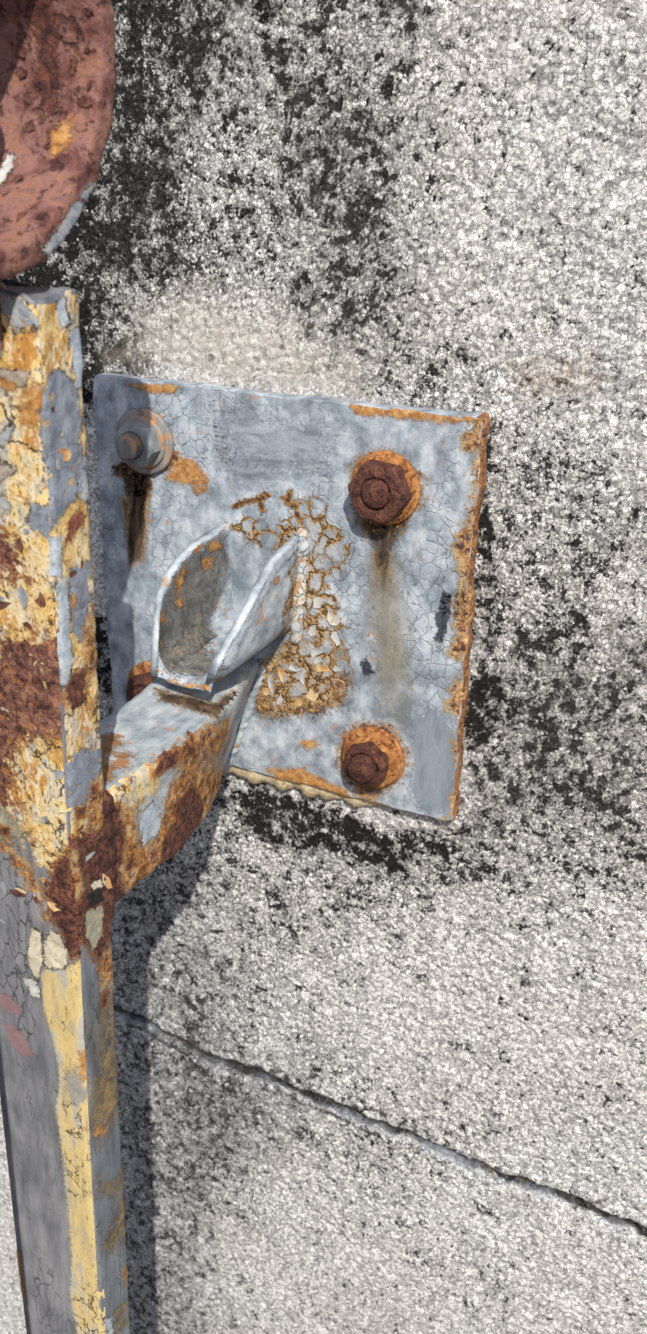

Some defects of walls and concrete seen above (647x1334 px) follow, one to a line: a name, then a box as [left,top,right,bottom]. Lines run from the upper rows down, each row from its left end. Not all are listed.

corrosion [14,0,93,159]
corrosion [0,151,24,188]
damp [10,0,438,403]
corrosion [0,516,46,608]
corrosion [62,510,85,555]
peeling [0,290,161,911]
corrosion [111,451,209,567]
corrosion [343,404,488,768]
corrosion [0,530,299,1141]
corrosion [265,715,410,803]
peeling [0,993,34,1057]
crack [114,994,647,1238]